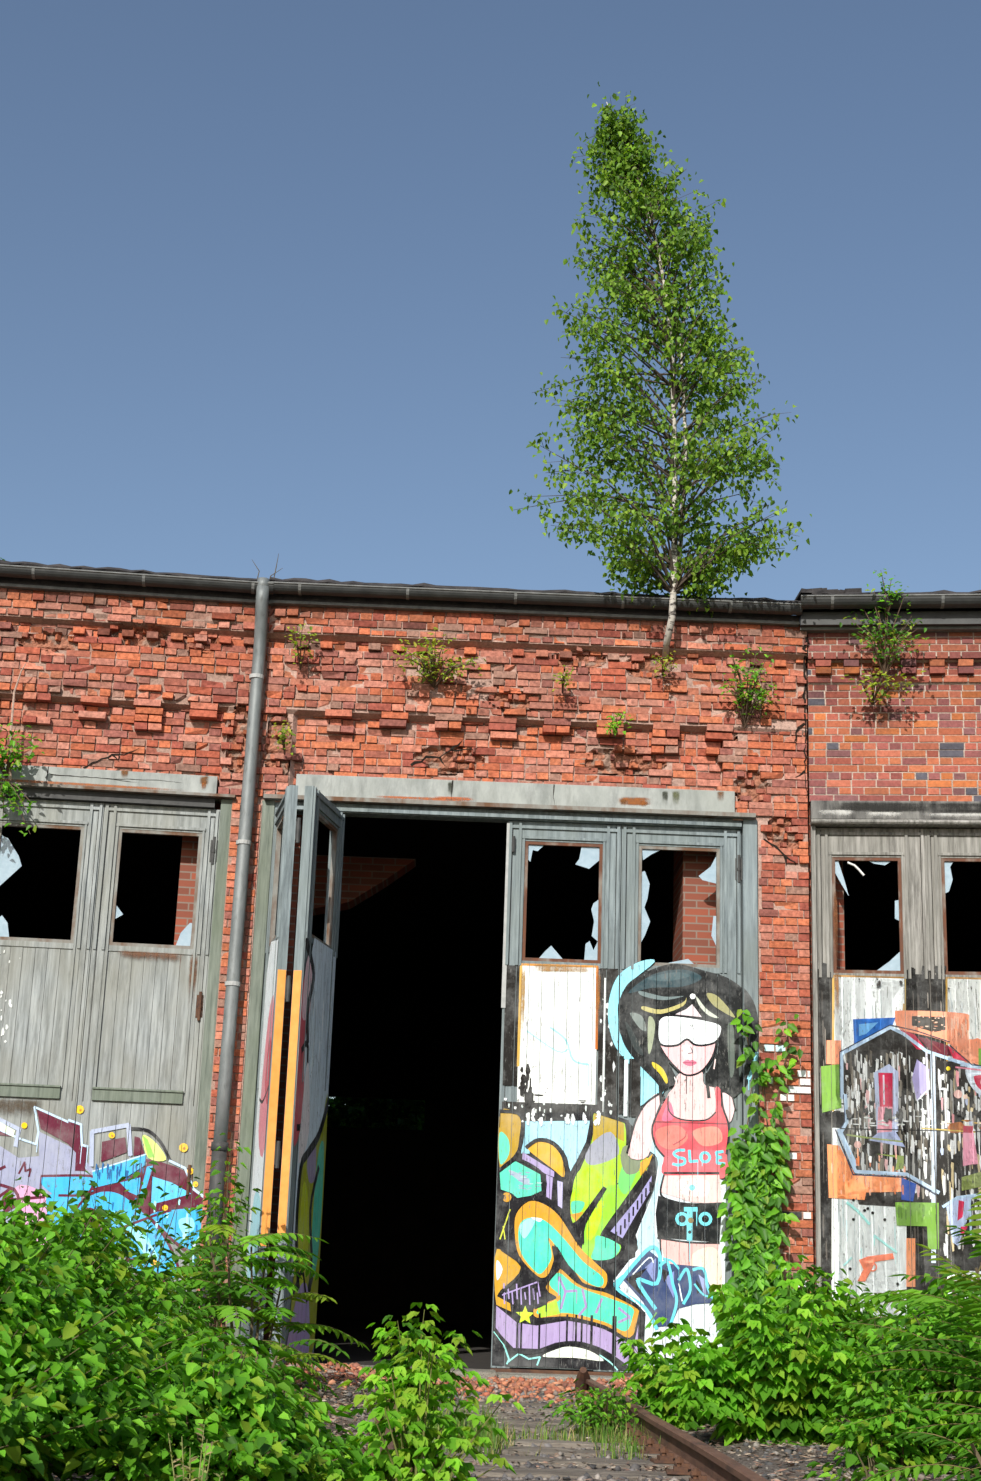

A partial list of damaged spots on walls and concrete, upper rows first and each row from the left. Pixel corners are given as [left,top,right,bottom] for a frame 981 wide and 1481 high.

peeling [518,1003,615,1126]